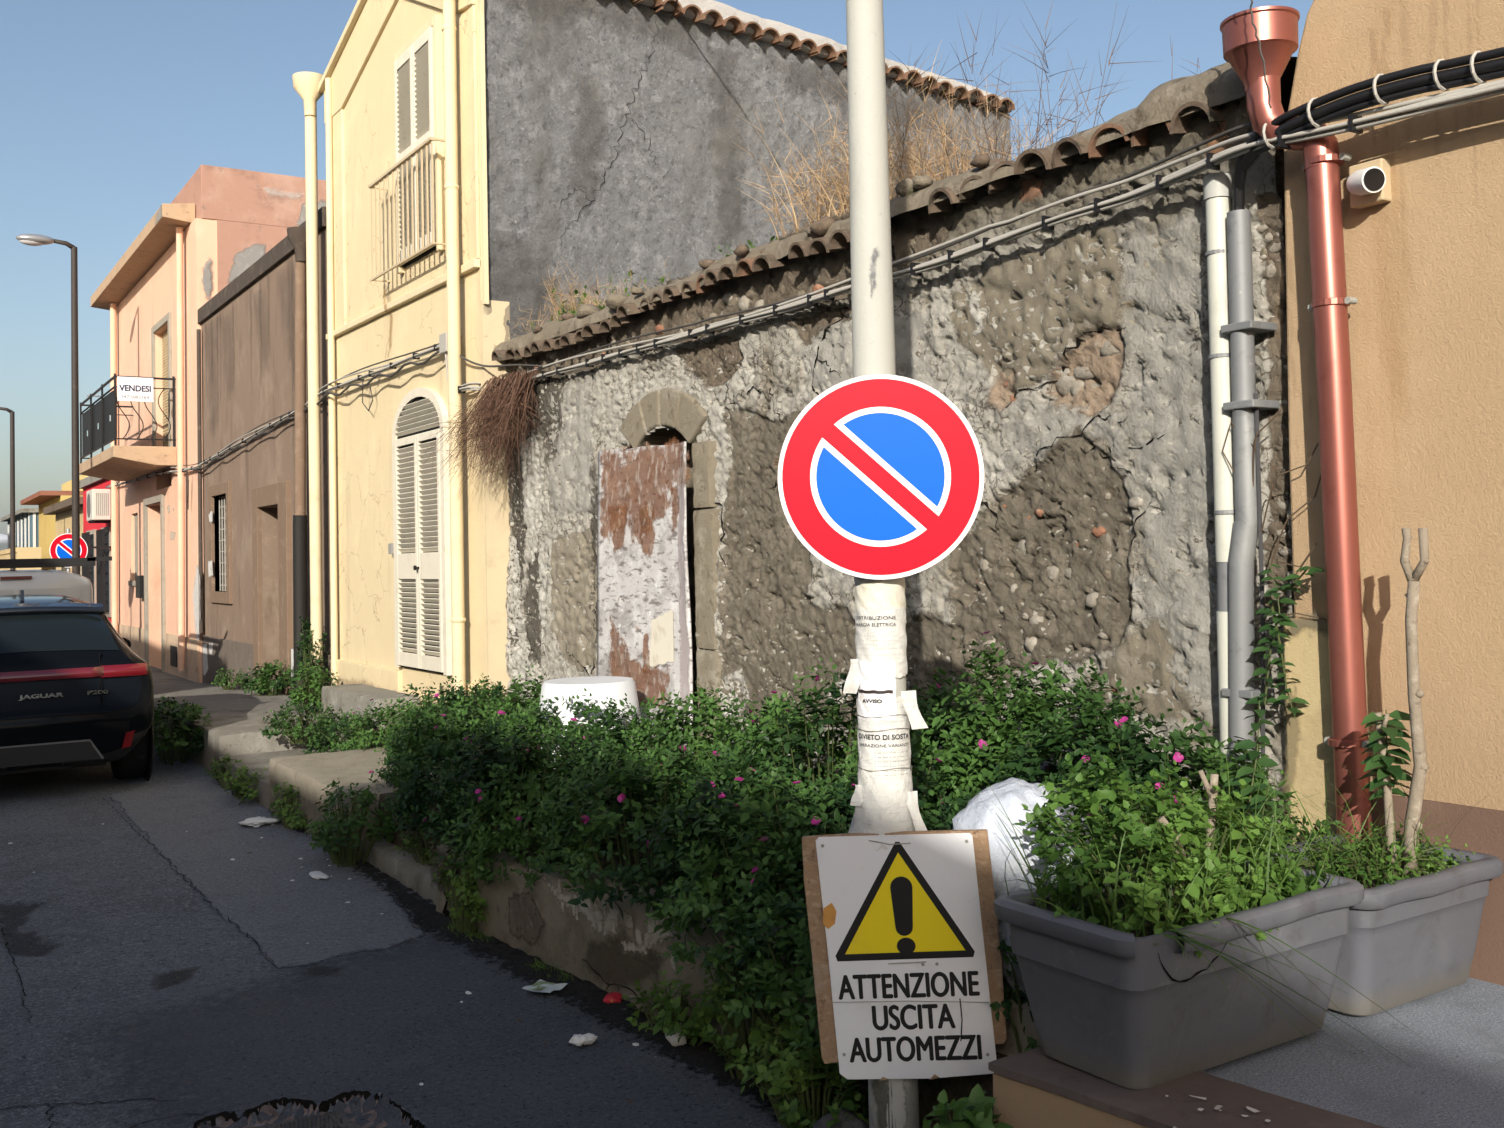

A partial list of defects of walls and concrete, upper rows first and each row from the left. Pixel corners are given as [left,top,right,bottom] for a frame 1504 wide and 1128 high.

crack [559,15,659,246]
flaking render [894,311,937,388]
spalling [890,198,956,273]
spalling [506,230,858,730]
spalling [905,215,1217,717]
peeling [539,875,676,972]